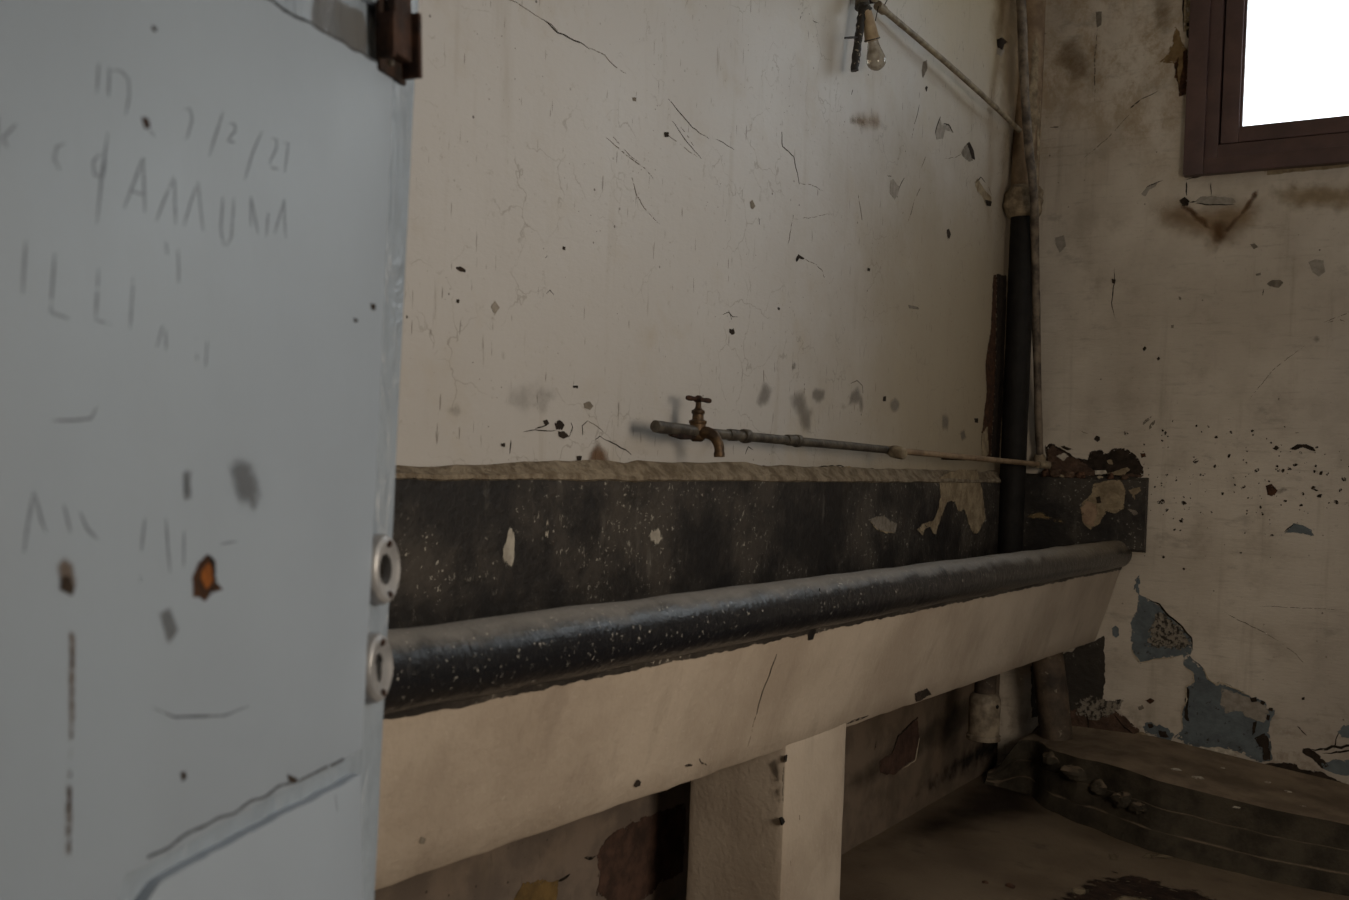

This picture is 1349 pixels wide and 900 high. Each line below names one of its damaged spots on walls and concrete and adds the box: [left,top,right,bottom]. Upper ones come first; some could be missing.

crack [510,0,624,73]
peeling [1160,0,1190,97]
spalling [981,274,1007,458]
flaking render [869,515,897,533]
flaking render [917,469,986,535]
spalling [1045,426,1349,536]
peeling [1070,576,1349,793]
peeling [584,803,686,900]